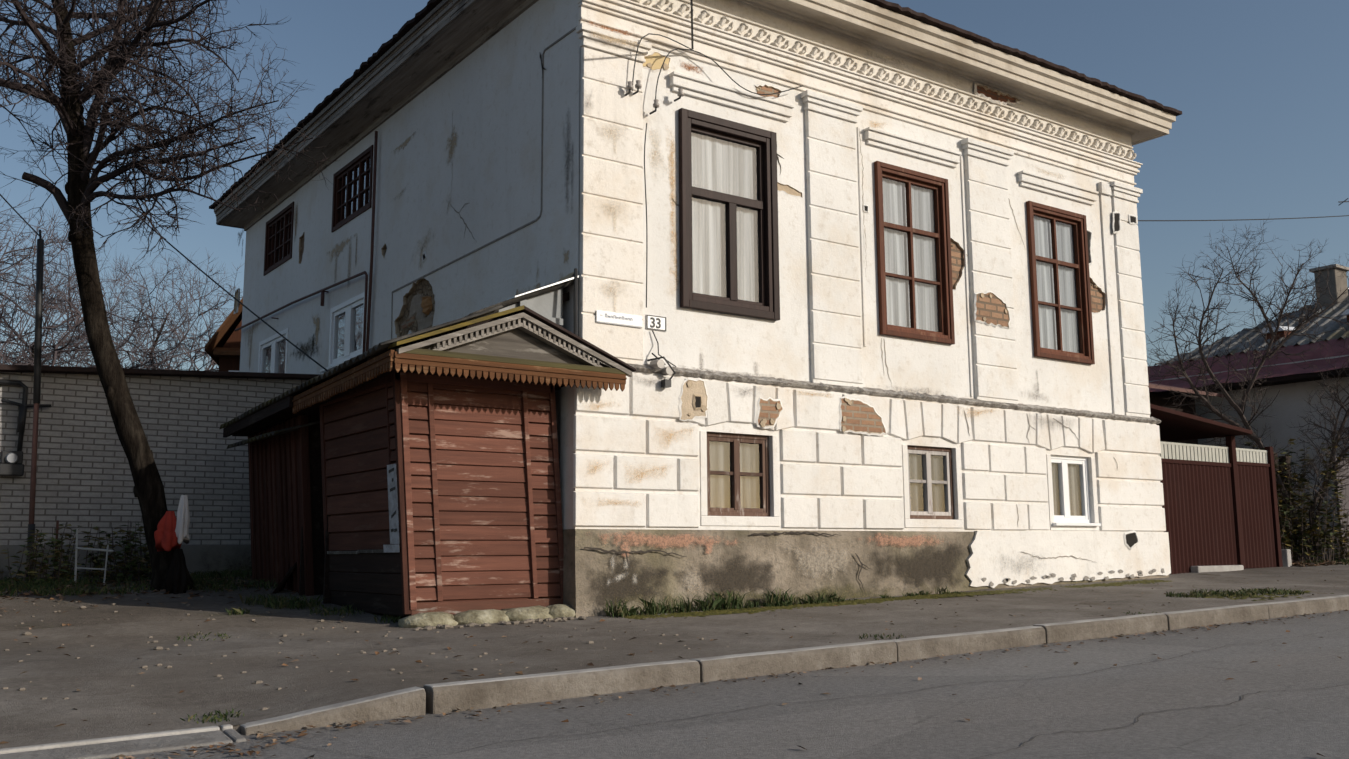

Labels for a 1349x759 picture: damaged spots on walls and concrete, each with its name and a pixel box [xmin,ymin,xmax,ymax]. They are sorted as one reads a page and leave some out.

spalling [1113,211,1137,234]
spalling [951,237,968,290]
spalling [1087,229,1106,314]
spalling [394,251,436,337]
spalling [974,291,1010,329]
spalling [679,377,708,421]
spalling [756,397,784,429]
spalling [839,396,887,436]
leakage [592,558,683,607]
leakage [703,556,775,595]
leakage [876,544,962,587]